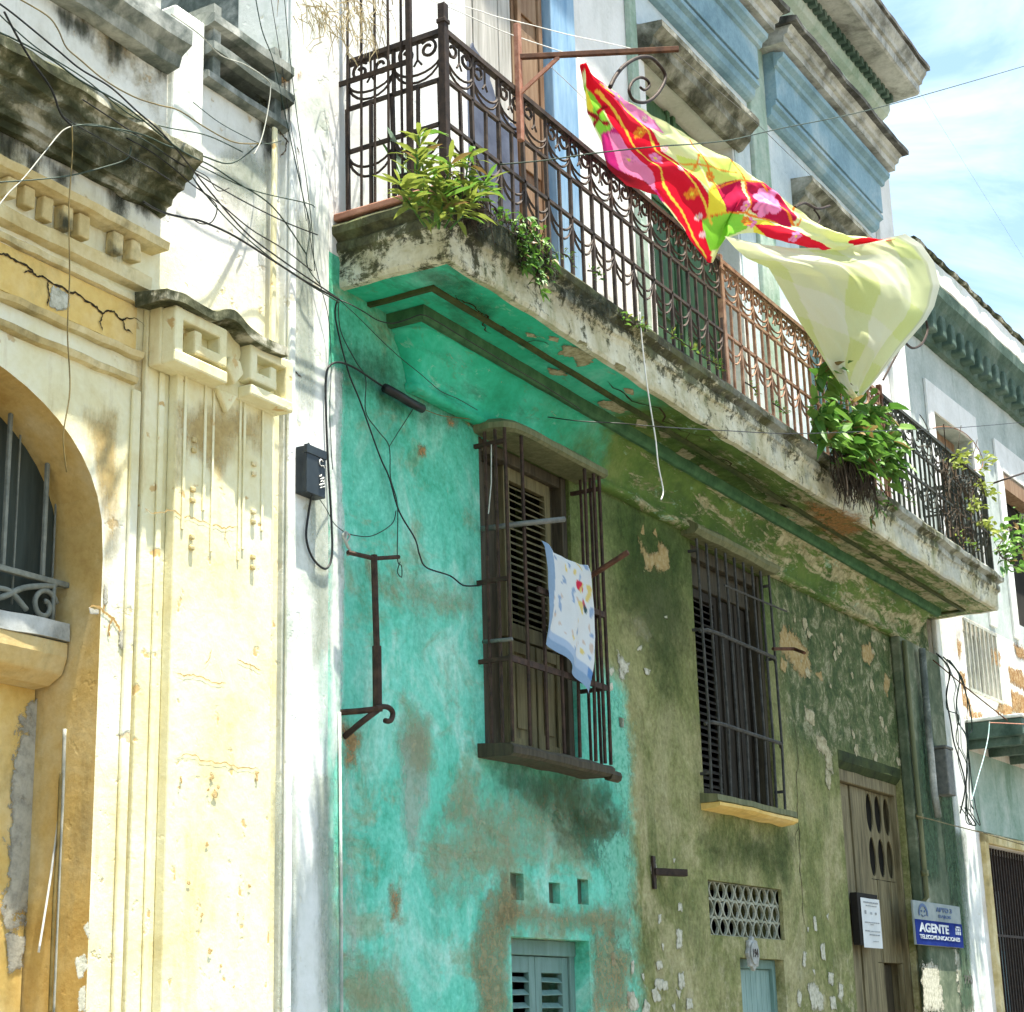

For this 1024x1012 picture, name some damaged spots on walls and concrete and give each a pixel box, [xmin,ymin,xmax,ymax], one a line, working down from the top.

damp [58,8,93,36]
damp [102,33,130,62]
damp [0,131,74,185]
damp [109,190,150,216]
crack [0,252,144,334]
peeling [526,332,594,376]
spalling [638,525,670,574]
spalling [779,617,832,688]
crack [179,753,258,769]
peeling [804,705,834,790]
peeling [0,699,37,974]
flaking render [473,880,693,1012]